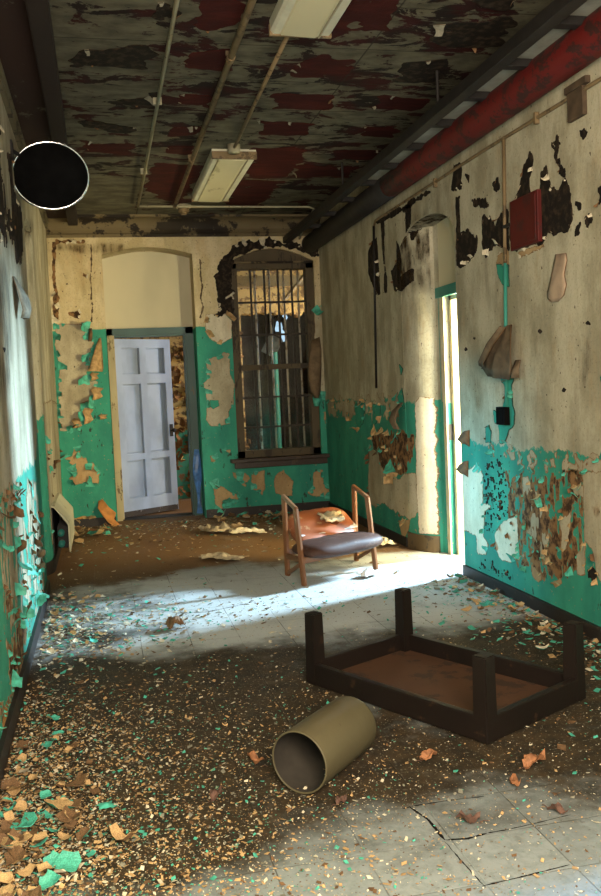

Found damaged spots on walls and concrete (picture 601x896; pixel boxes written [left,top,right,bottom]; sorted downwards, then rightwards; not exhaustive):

peeling [333,0,400,31]
peeling [225,147,382,209]
peeling [368,190,431,295]
peeling [451,135,601,268]
peeling [0,239,120,729]
peeling [170,344,191,497]
peeling [209,470,293,513]
peeling [200,236,319,427]
peeling [308,305,440,537]
flaking render [478,324,521,399]
peeling [456,425,601,588]
crack [403,796,568,886]